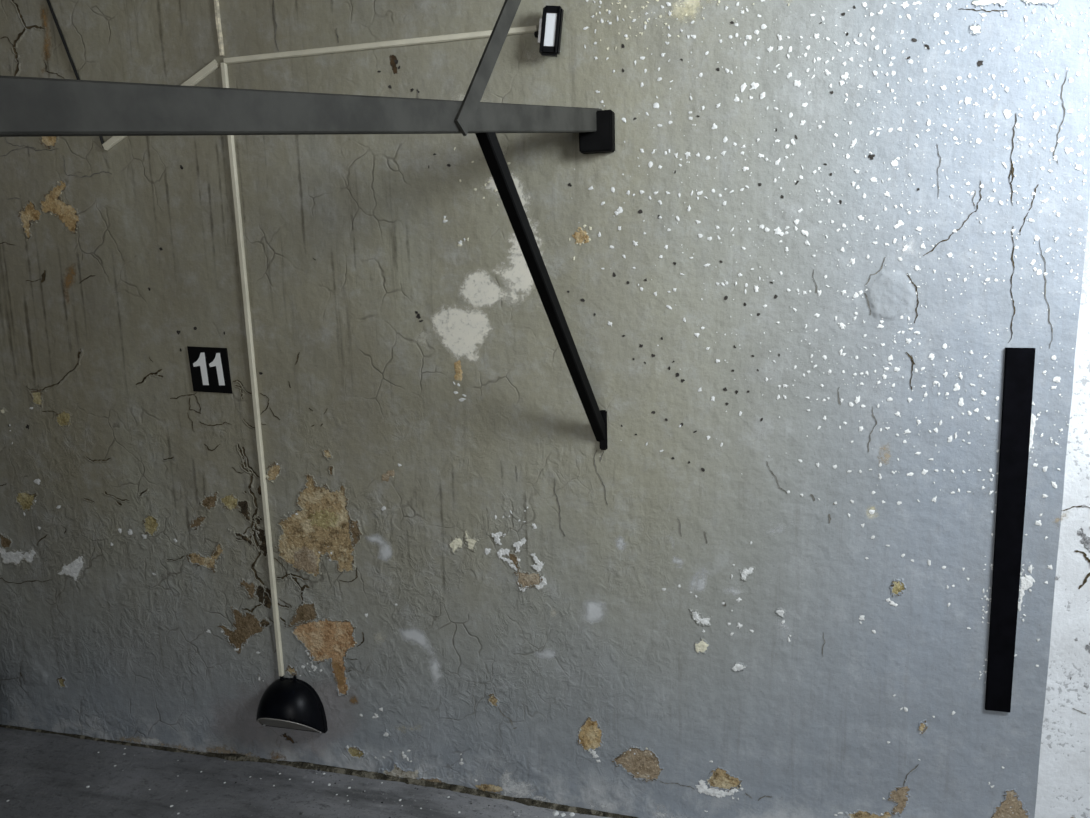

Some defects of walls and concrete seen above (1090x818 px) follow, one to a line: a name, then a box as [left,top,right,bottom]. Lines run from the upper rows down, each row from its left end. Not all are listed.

crack [0,0,64,78]
leakage [474,177,498,206]
leakage [507,162,546,265]
leakage [418,233,533,361]
crack [83,489,149,507]
crack [136,352,309,653]
peeling [185,448,363,578]
peeling [446,507,547,592]
peeling [206,578,273,654]
peeling [285,600,358,696]
peeling [576,716,664,782]
peeling [695,760,743,800]